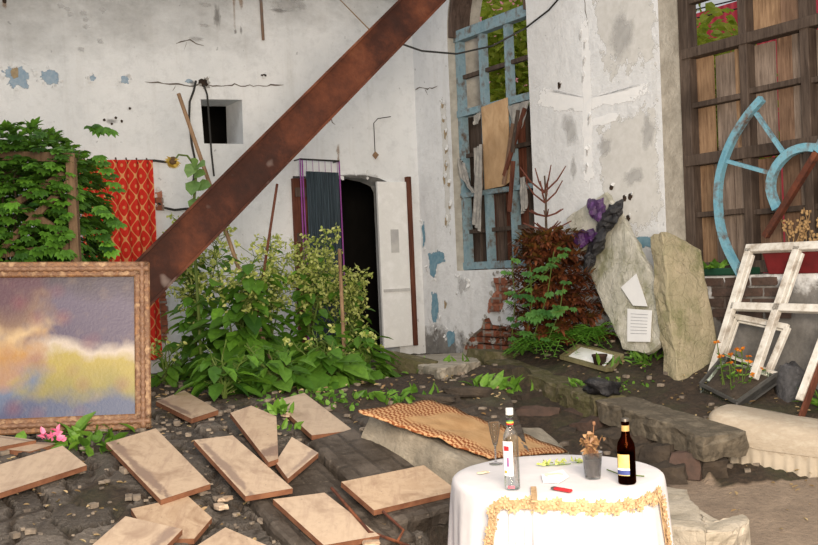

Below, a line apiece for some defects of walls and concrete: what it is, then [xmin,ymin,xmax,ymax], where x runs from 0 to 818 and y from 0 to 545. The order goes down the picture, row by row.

peeling [0,62,63,91]
peeling [419,220,445,281]
flaking render [429,270,523,350]